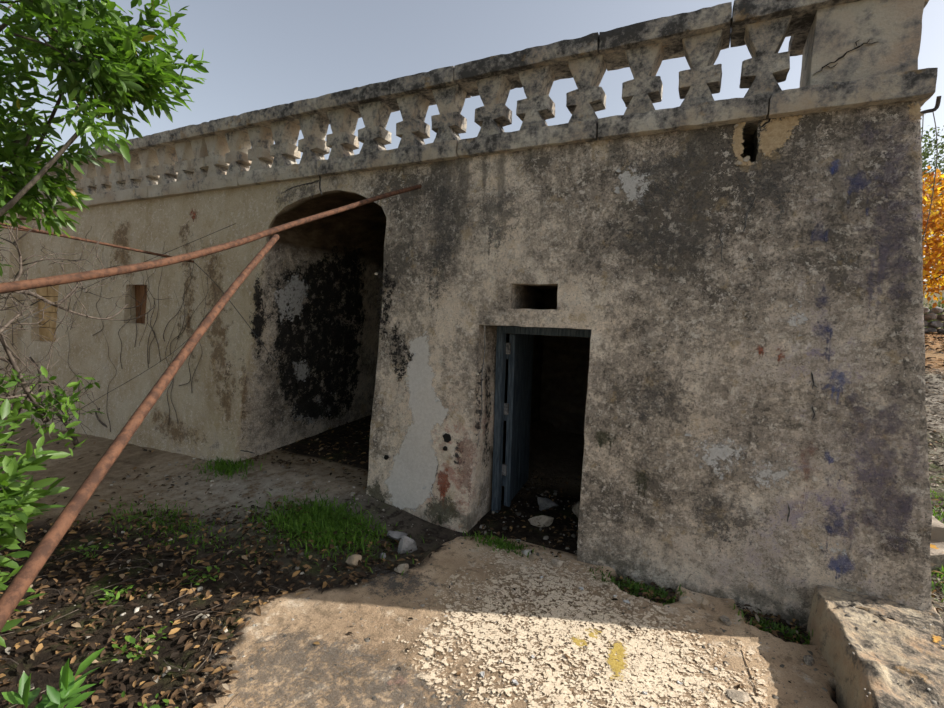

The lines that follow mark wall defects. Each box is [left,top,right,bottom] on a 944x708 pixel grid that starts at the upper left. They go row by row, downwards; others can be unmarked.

crack [813,39,878,75]
spalling [731,115,803,166]
water stain [178,226,249,429]
water stain [249,246,368,428]
rust [437,468,451,504]